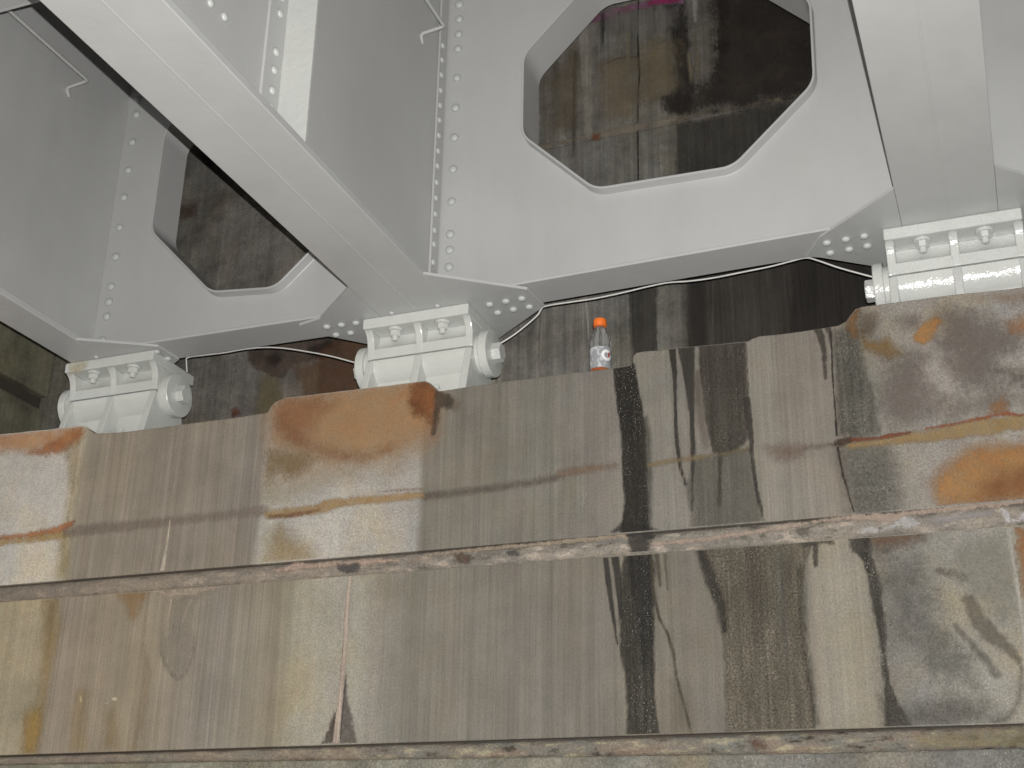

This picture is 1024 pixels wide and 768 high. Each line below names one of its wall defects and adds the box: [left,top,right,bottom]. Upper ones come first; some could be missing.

corrosion [847,309,899,357]
corrosion [914,318,941,344]
corrosion [258,339,437,455]
corrosion [0,428,81,454]
corrosion [834,402,1024,504]
corrosion [0,521,75,547]
corrosion [265,493,422,556]
water stain [603,257,877,734]
crack [322,576,356,744]